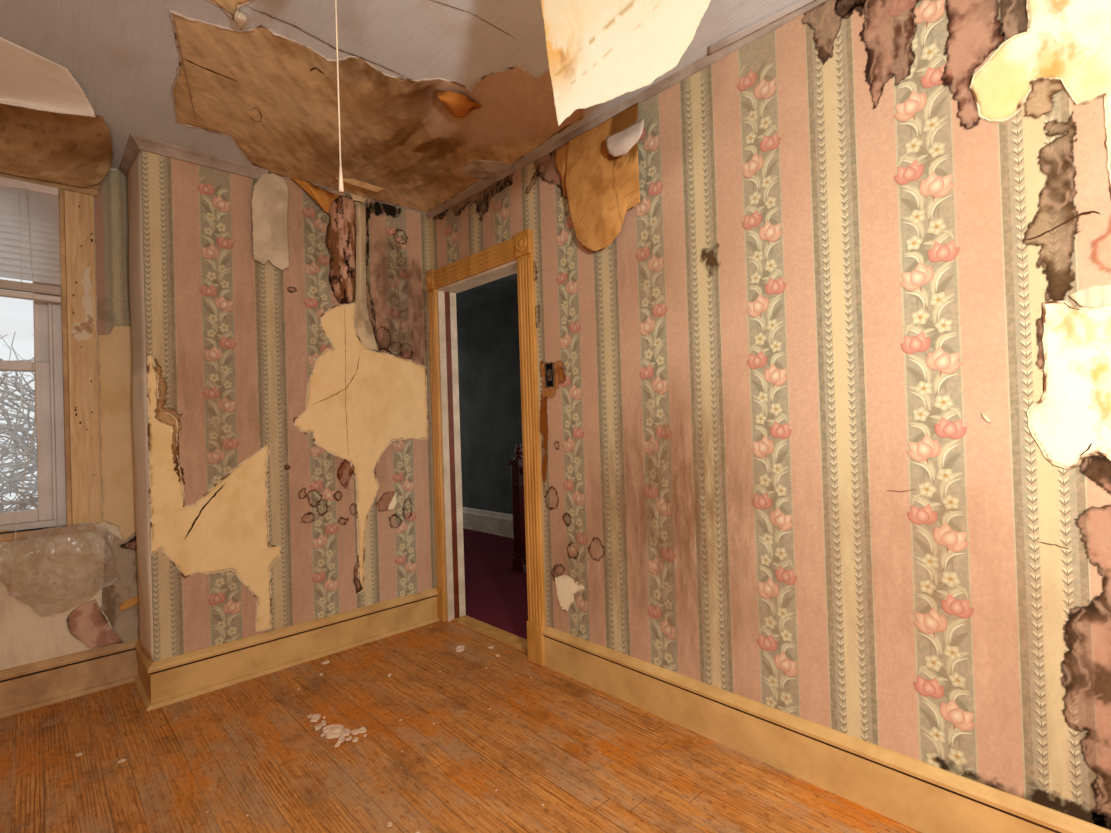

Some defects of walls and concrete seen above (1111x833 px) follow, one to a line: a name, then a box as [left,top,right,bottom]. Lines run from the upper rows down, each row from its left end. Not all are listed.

flaking render [0,103,113,188]
flaking render [169,0,584,213]
flaking render [969,0,1111,193]
flaking render [71,267,282,632]
flaking render [293,302,429,593]
flaking render [1026,300,1111,470]
flaking render [66,599,122,648]
flaking render [551,564,584,612]
leakage [1031,443,1111,830]
leakage [935,757,1005,792]